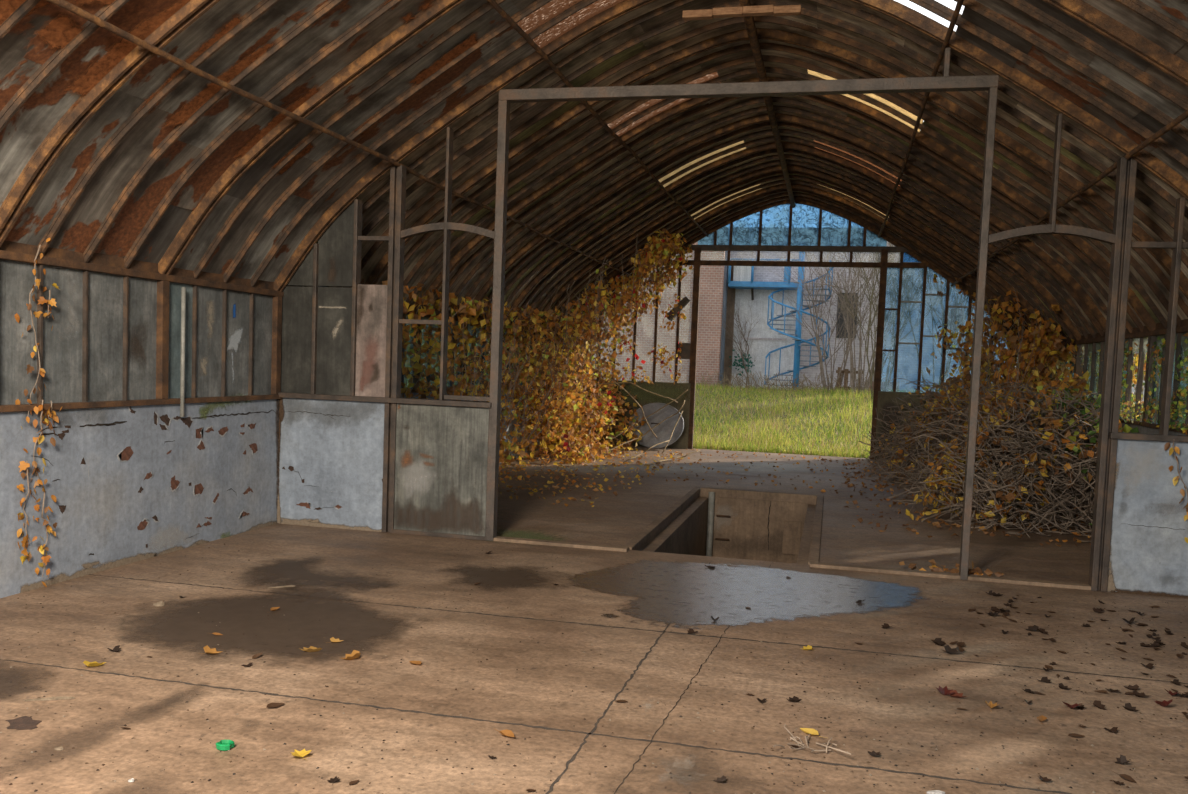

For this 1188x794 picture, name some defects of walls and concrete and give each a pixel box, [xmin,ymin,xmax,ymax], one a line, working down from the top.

corrosion [0,0,51,25]
corrosion [35,0,115,48]
spalling [117,446,133,462]
spalling [154,411,258,455]
damp [125,559,408,660]